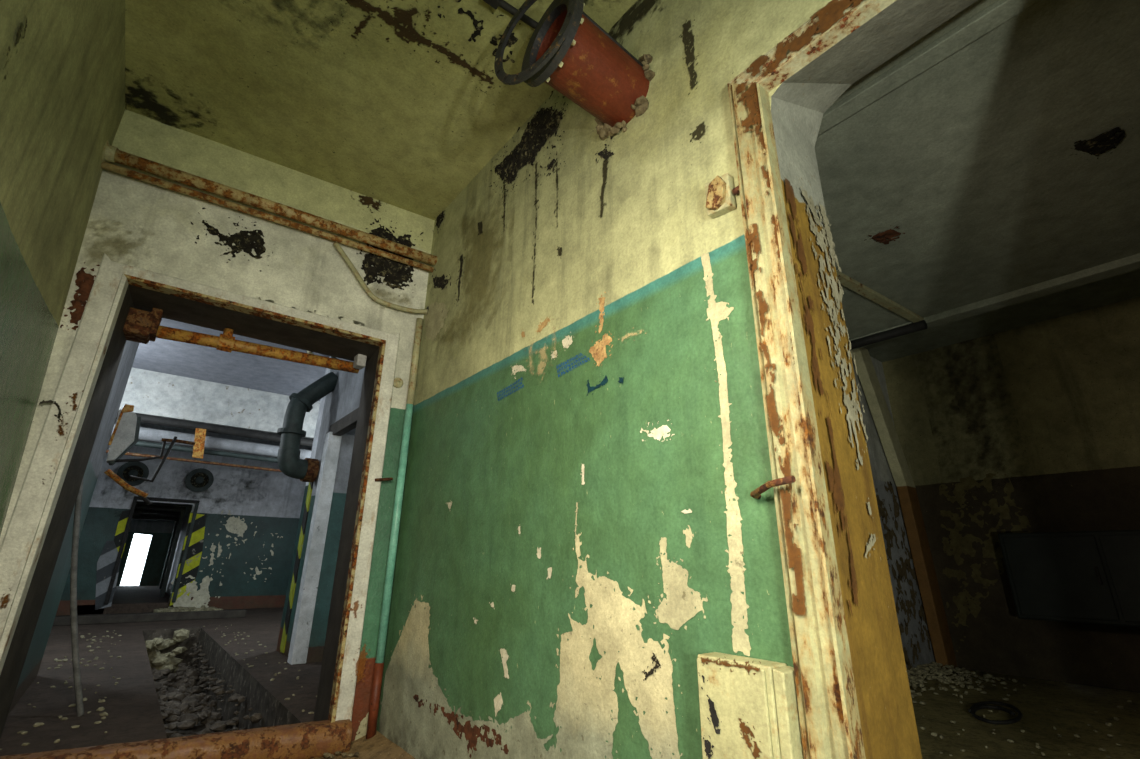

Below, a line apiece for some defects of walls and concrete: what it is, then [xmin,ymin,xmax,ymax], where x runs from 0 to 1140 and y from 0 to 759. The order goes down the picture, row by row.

water stain [329,0,531,94]
water stain [125,68,210,129]
water stain [531,163,539,304]
water stain [600,159,608,217]
peeling [589,292,614,367]
peeling [796,176,868,470]
corrosion [745,223,806,616]
corrosion [771,178,858,616]
peeling [355,509,708,759]
corrosion [701,657,761,675]
peeling [698,672,722,759]
corrosion [738,718,762,759]